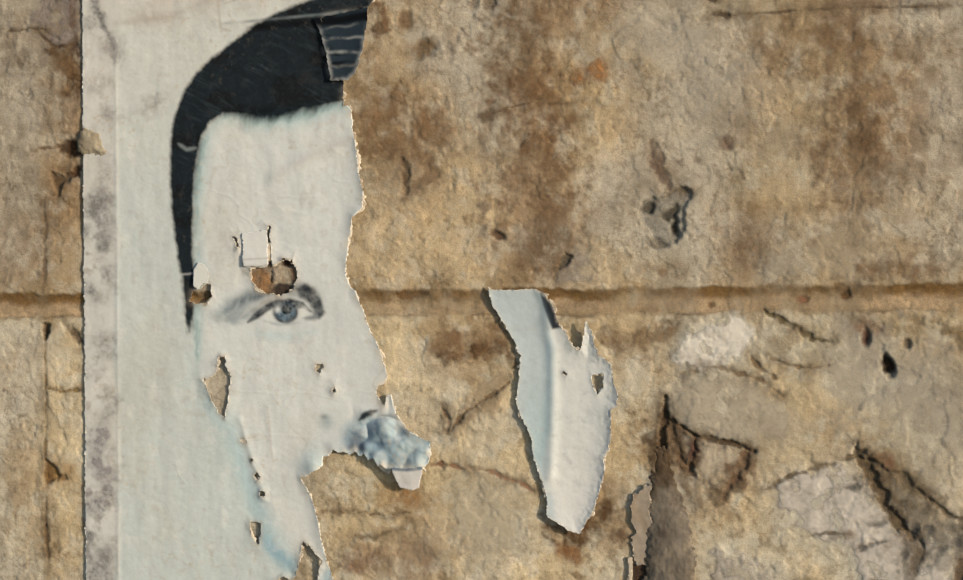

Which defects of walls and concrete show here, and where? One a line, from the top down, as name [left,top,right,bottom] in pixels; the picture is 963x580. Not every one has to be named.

crack [709,0,736,19]
water stain [494,1,575,176]
spalling [640,143,691,248]
spalling [252,259,297,296]
spalling [396,289,426,300]
crack [694,356,829,396]
crack [763,309,828,342]
crack [657,394,756,501]
peeling [628,446,697,580]
crack [772,446,963,574]
peeling [776,464,962,580]
crack [954,559,963,580]